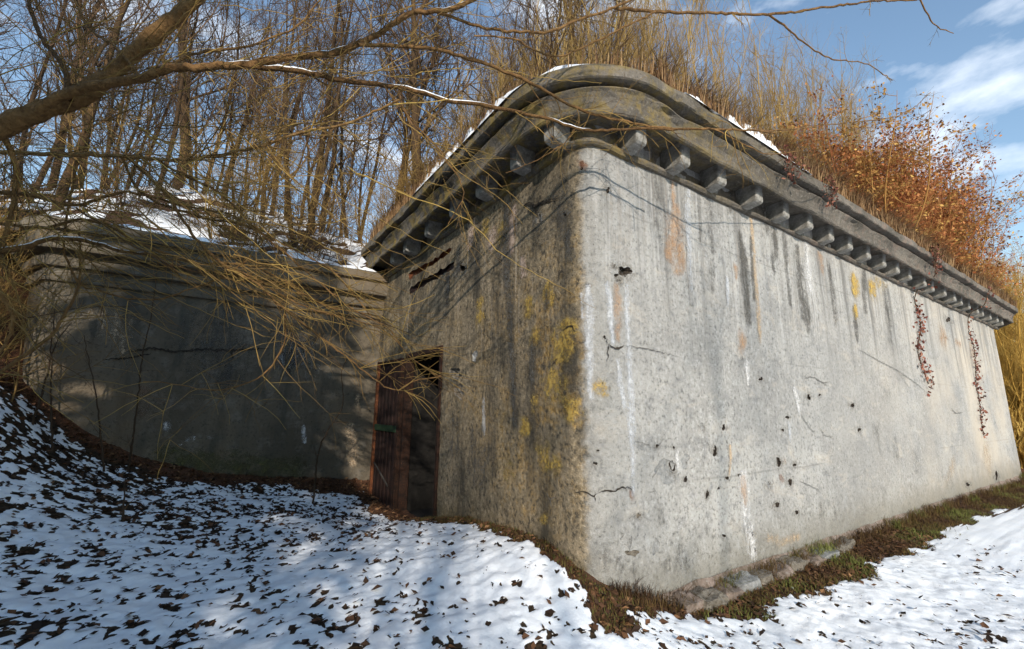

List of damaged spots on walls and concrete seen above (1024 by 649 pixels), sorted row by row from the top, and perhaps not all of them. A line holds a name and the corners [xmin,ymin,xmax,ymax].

hole [612,264,634,284]
damp [738,232,756,324]
damp [764,214,811,332]
crack [102,347,267,360]
efflorescence [582,285,593,398]
efflorescence [606,283,614,343]
efflorescence [617,297,635,473]
crack [605,336,674,359]
crack [546,439,663,503]